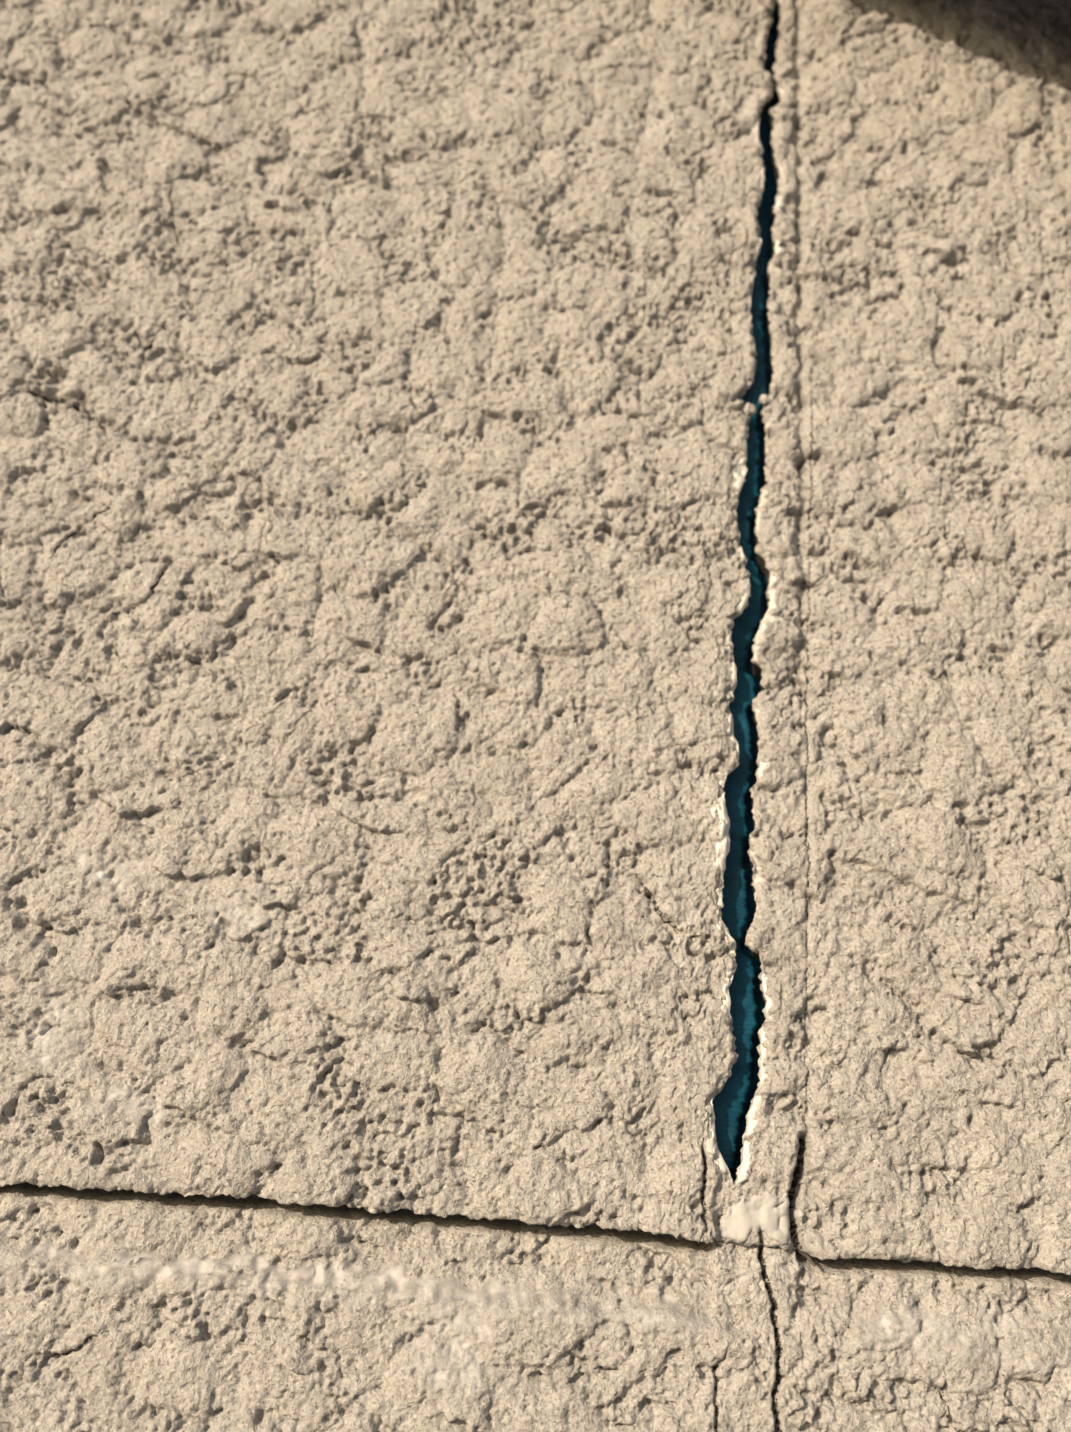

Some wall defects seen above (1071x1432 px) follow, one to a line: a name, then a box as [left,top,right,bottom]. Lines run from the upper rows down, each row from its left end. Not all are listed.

crack [636,0,816,1432]